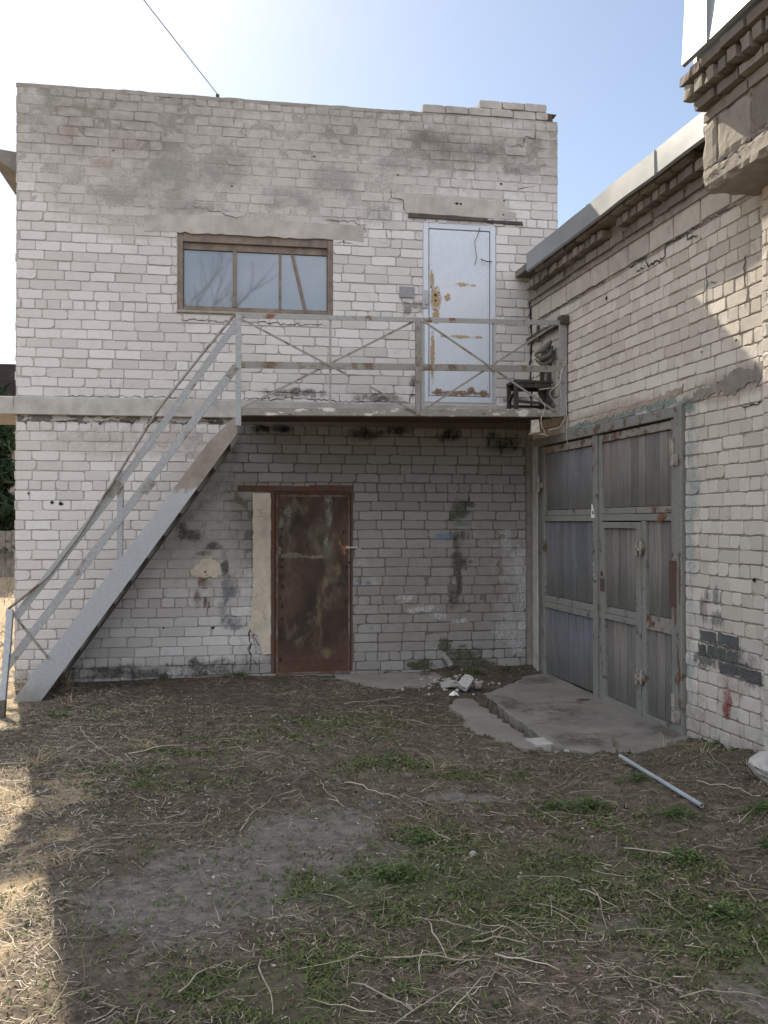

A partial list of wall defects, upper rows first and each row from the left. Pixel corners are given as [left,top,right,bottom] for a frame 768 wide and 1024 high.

crack [627,205,736,272]
crack [247,506,266,668]